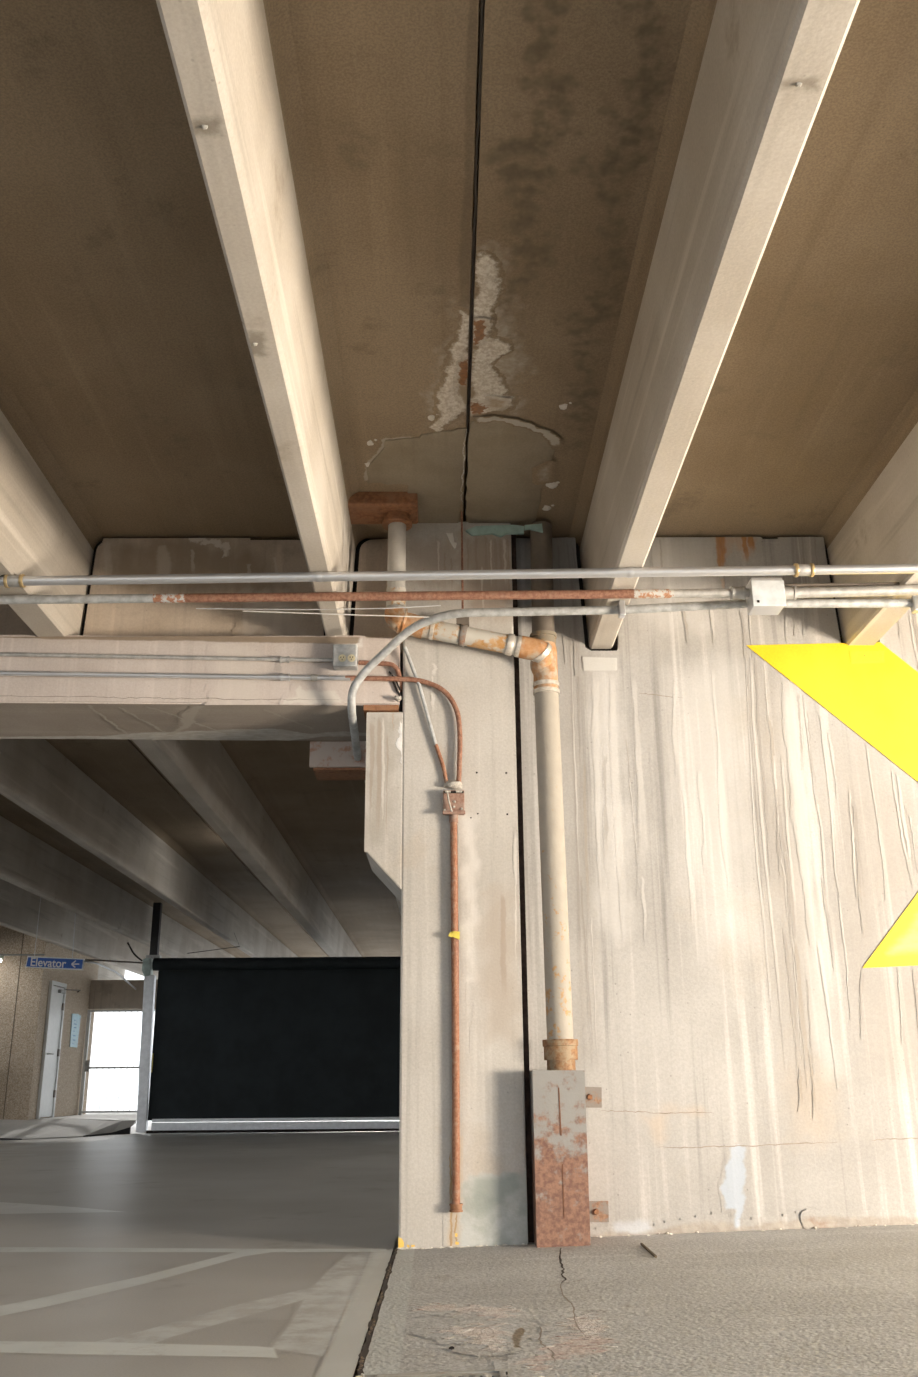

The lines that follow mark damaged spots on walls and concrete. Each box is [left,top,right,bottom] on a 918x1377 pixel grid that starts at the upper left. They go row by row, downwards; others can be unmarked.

crack [455,0,484,432]
water stain [407,0,692,459]
corrosion [443,1131,467,1248]
crack [538,1326,556,1363]
crack [550,1248,585,1335]